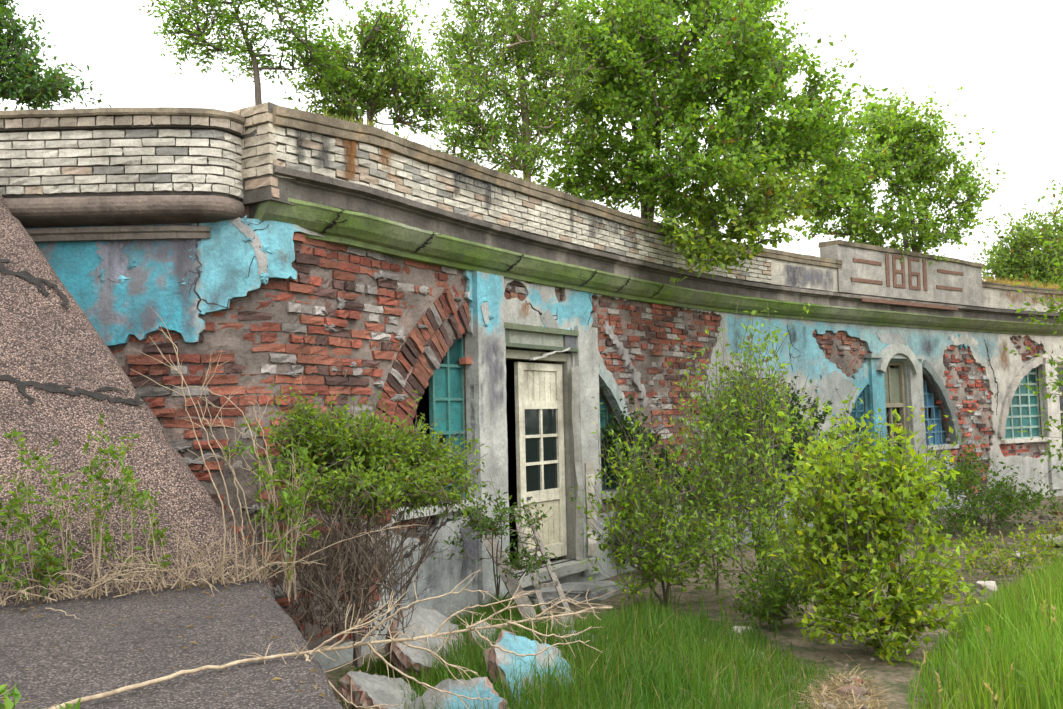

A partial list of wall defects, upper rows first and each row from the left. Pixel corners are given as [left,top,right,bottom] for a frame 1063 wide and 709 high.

peeling [96,241,137,284]
crack [178,220,269,312]
crack [317,209,347,234]
flaking render [504,280,532,301]
crack [0,374,167,406]
flaking render [107,215,494,650]
flaking render [590,295,721,507]
flaking render [812,330,871,423]
flaking render [930,334,1046,497]